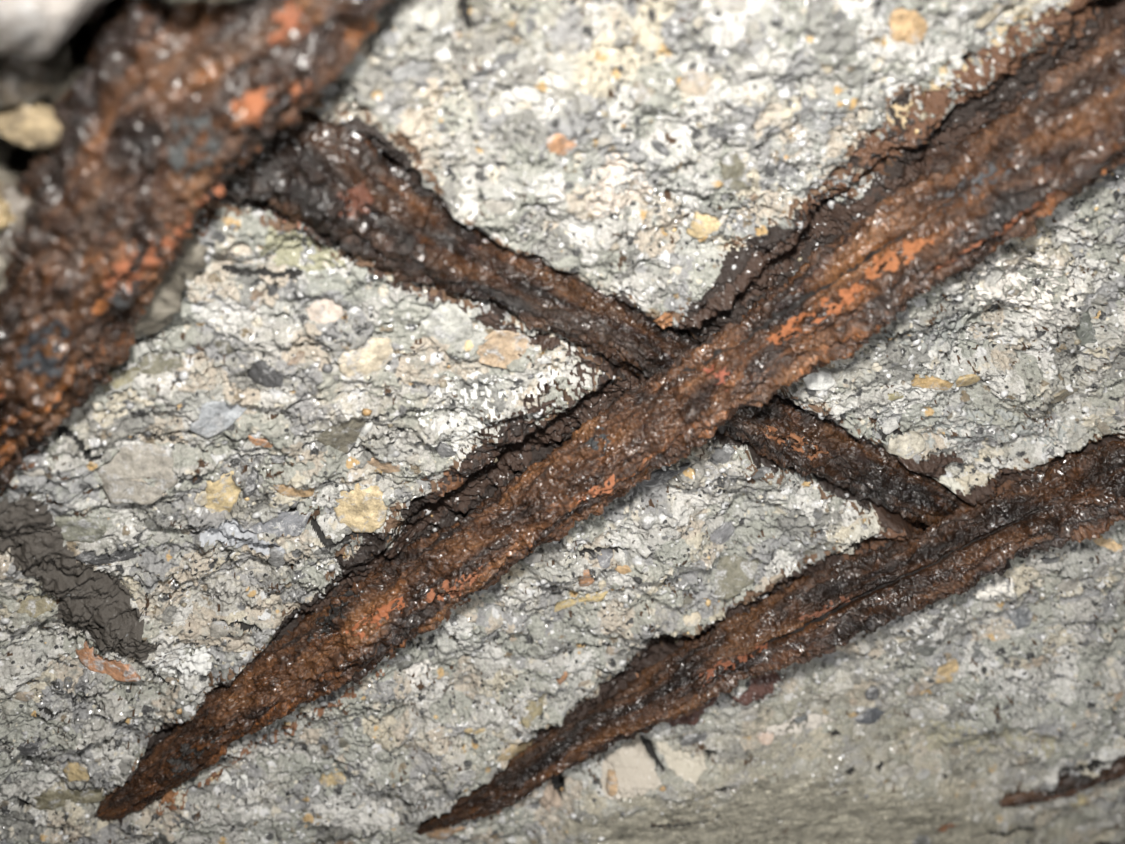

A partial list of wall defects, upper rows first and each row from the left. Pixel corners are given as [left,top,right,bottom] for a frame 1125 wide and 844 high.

rust [608,233,630,271]
spalling [962,237,1087,326]
spalling [418,365,560,458]
rust [191,450,208,483]
spalling [932,475,965,496]
spalling [199,518,287,556]
spalling [834,507,880,555]
peeling [0,493,211,682]
spalling [976,573,1015,603]
rust [410,666,454,716]
rust [986,678,1022,736]
rust [998,741,1125,843]